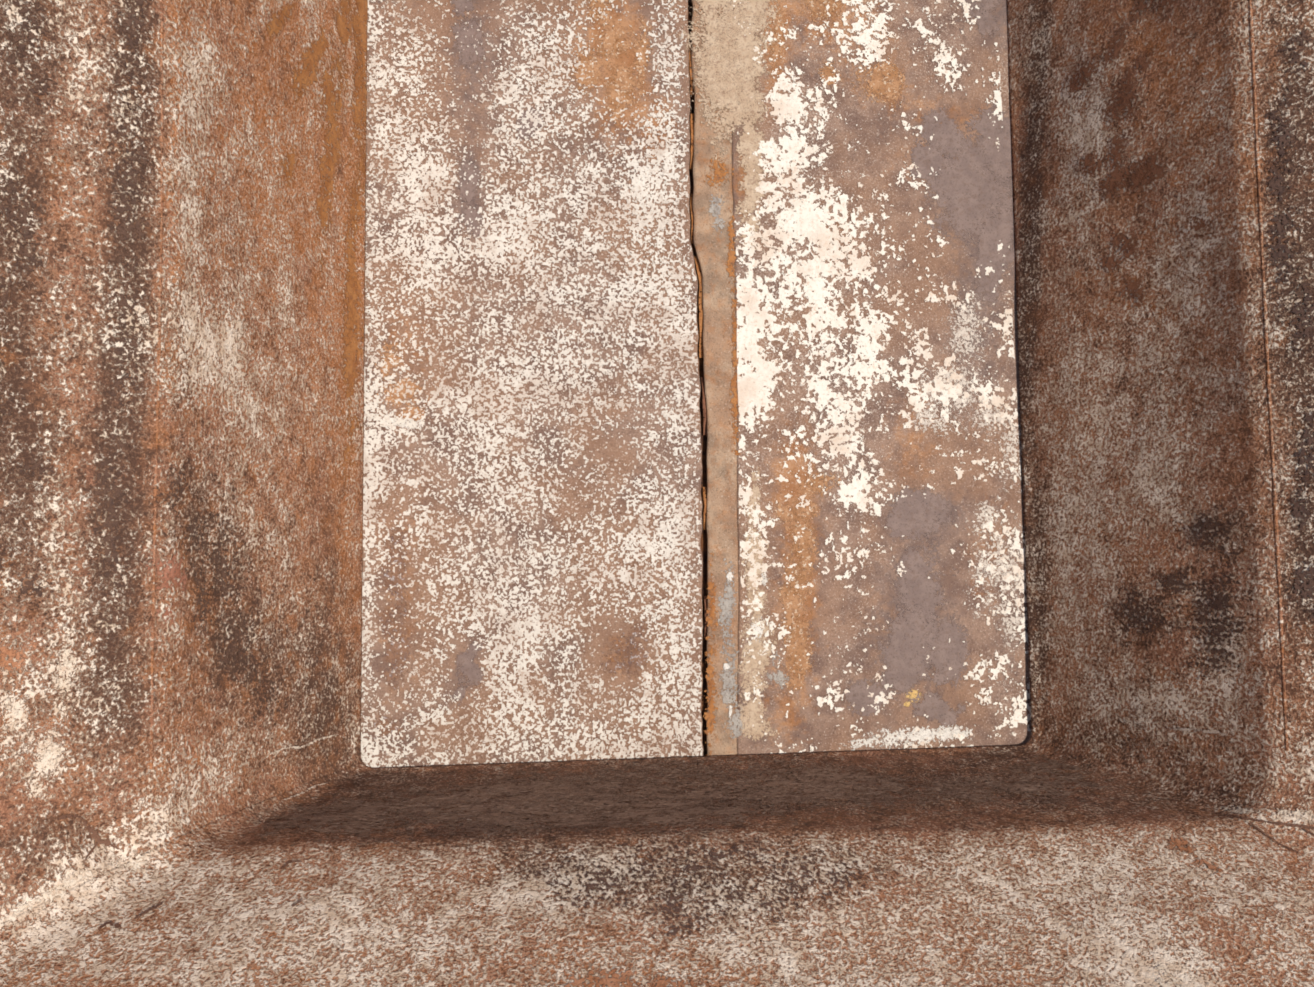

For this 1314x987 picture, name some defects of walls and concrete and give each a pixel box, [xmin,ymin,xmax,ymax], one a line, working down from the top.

rust [567,0,653,127]
rust [818,56,908,108]
rust [1065,0,1176,203]
rust [289,0,432,510]
rust [726,210,741,455]
peeling [723,0,1031,754]
rust [371,714,404,740]
rust [377,512,413,695]
rust [602,622,649,679]
rust [703,552,719,756]
rust [774,467,846,701]
rust [529,956,701,987]